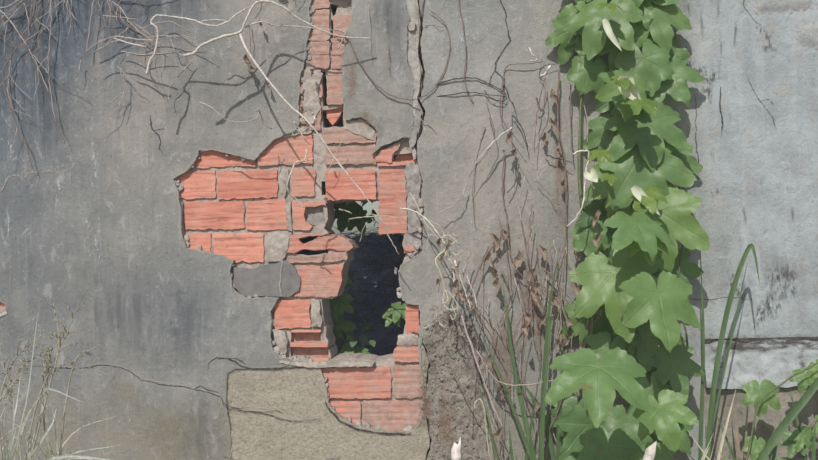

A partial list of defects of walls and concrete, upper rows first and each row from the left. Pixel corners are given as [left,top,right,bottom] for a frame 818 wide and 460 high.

crack [406,0,425,186]
crack [490,0,518,120]
flaking render [172,0,489,460]
crack [30,355,318,422]
leakage [728,338,813,349]